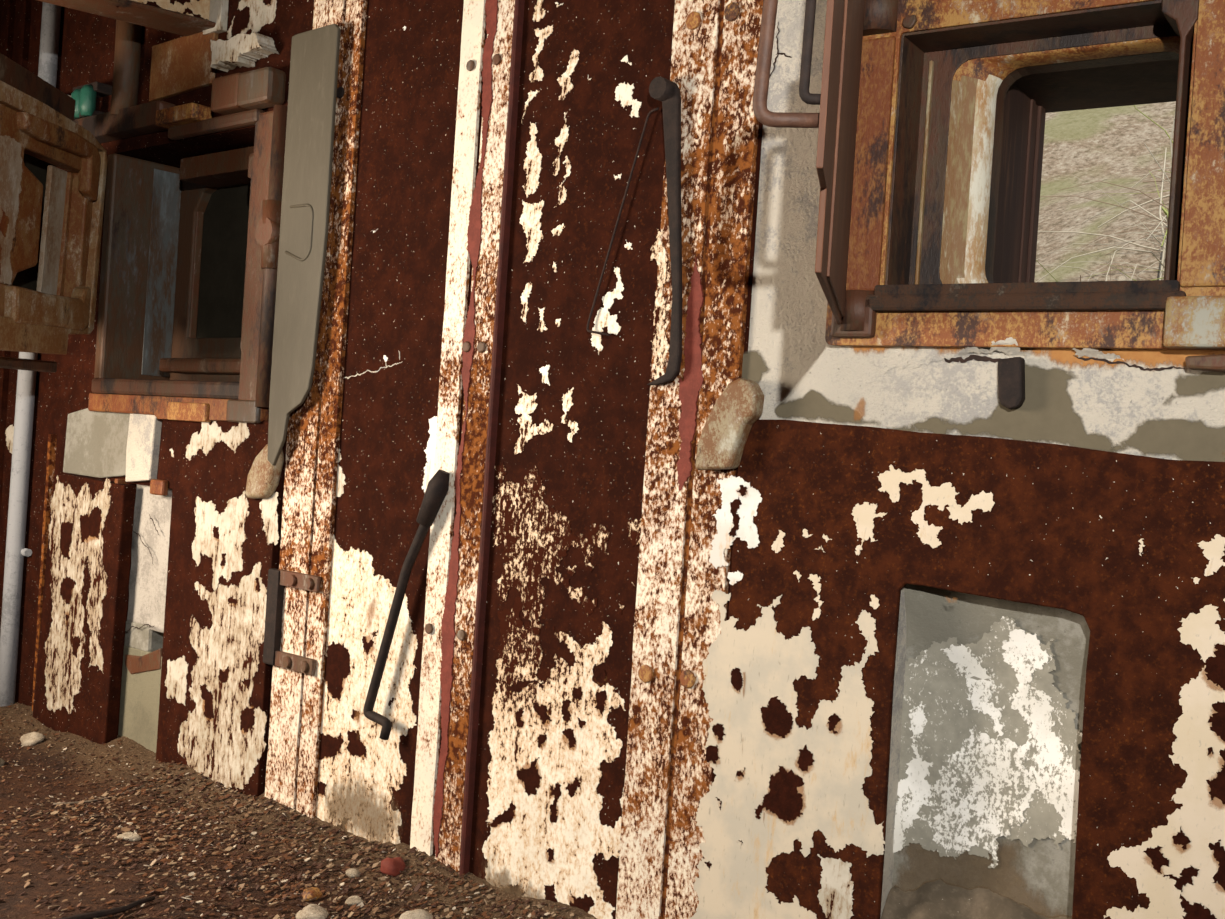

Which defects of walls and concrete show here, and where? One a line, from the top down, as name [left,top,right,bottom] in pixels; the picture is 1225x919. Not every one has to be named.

peeling [519,0,592,263]
peeling [615,82,642,118]
peeling [44,475,111,714]
peeling [165,491,279,790]
peeling [316,534,418,844]
peeling [482,365,626,919]
peeling [590,267,624,355]
peeling [689,475,885,919]
rust [854,400,865,420]
peeling [851,465,995,556]
rust [1020,348,1225,368]
peeling [1104,598,1225,919]